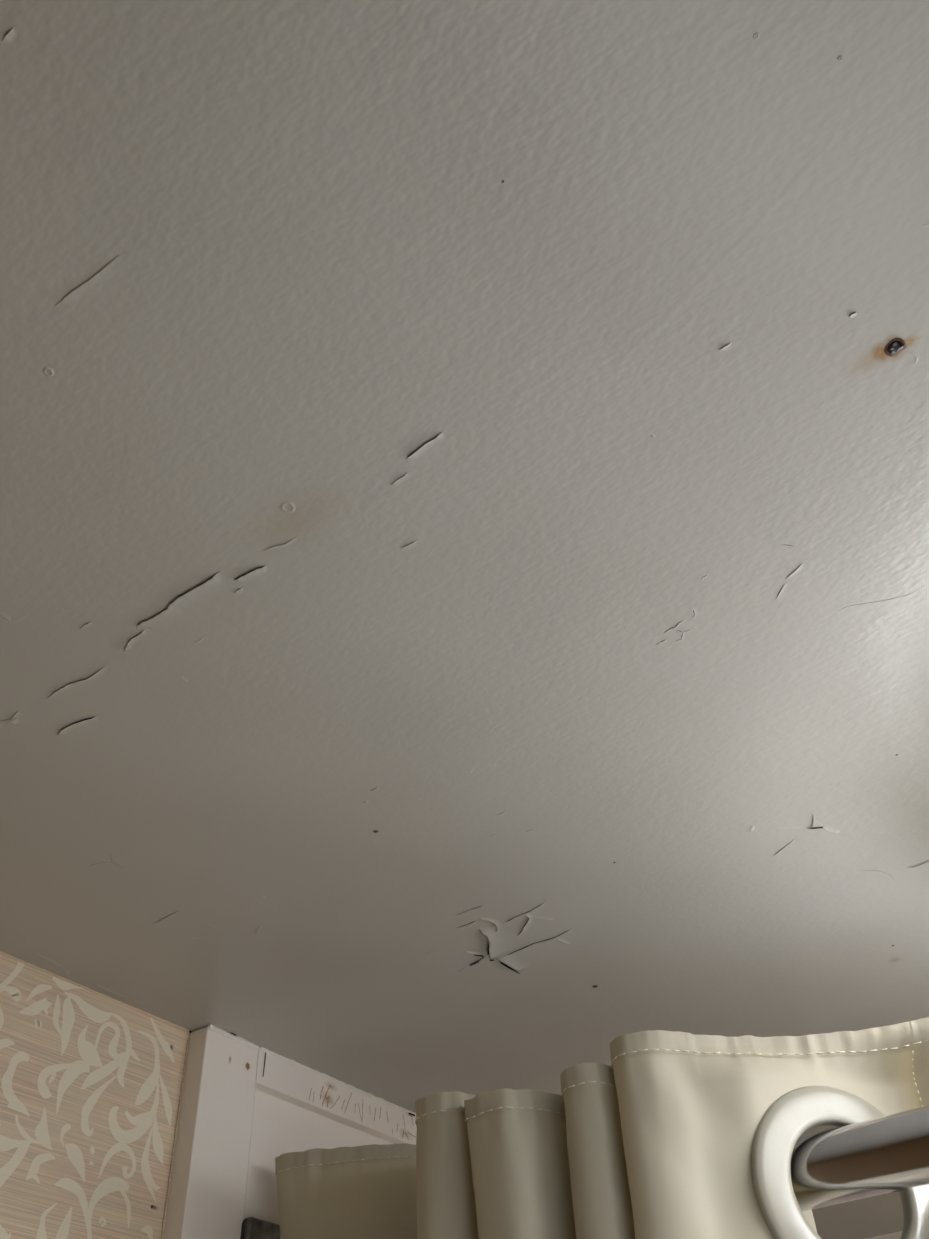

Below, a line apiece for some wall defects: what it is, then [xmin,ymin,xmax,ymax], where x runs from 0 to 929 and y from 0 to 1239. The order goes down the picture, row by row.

rust [876,337,920,365]
peeling [454,902,575,974]